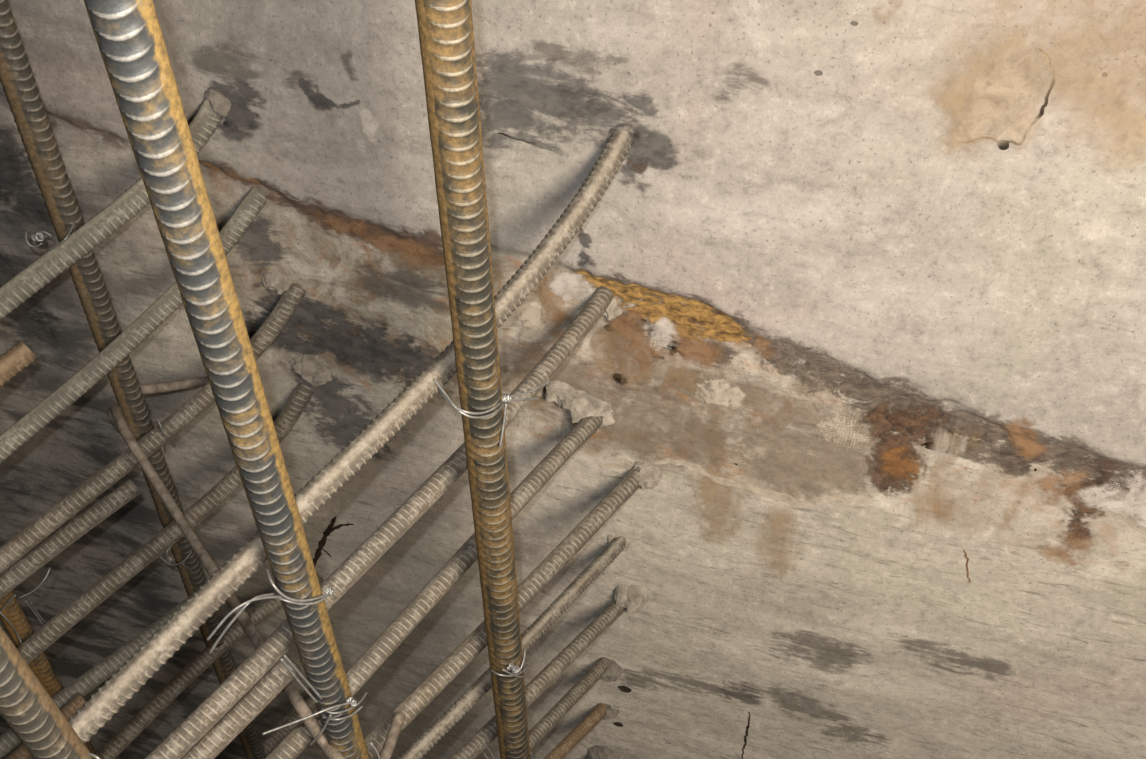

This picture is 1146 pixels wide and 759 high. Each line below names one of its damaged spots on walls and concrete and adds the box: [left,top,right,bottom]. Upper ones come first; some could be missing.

rust [45,109,125,145]
rust [198,160,444,265]
leakage [476,43,678,189]
rust [627,158,648,174]
crack [958,48,1056,146]
rust [575,270,771,368]
spalling [0,0,873,759]
rust [859,404,947,495]
rust [999,419,1046,466]
rust [1041,459,1127,564]
crack [742,712,751,759]